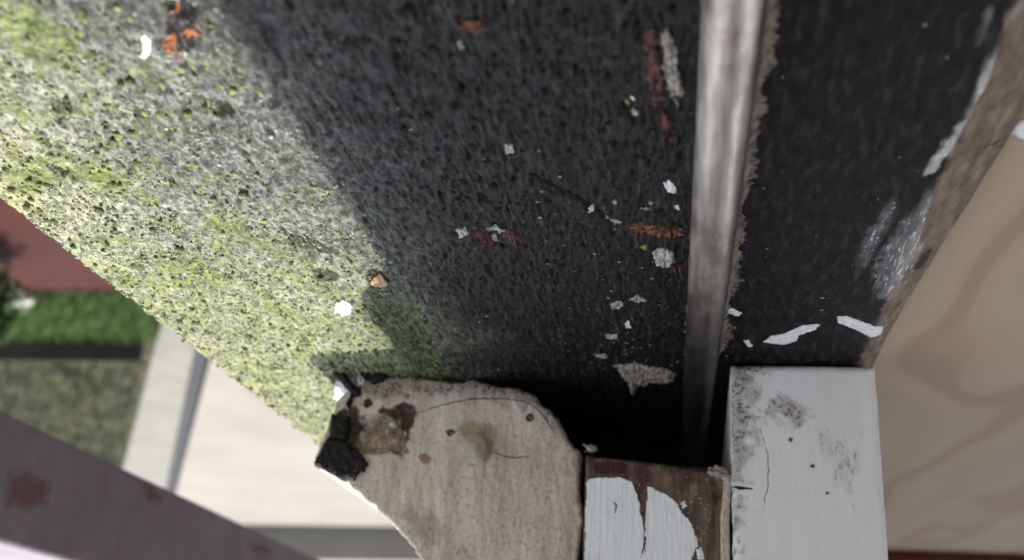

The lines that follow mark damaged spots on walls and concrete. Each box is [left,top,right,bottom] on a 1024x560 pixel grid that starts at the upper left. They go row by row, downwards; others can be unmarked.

rust [625,221,685,241]
peeling [744,324,820,347]
peeling [837,316,883,337]
water stain [335,406,364,450]
crack [731,421,769,501]
peeling [584,477,704,560]